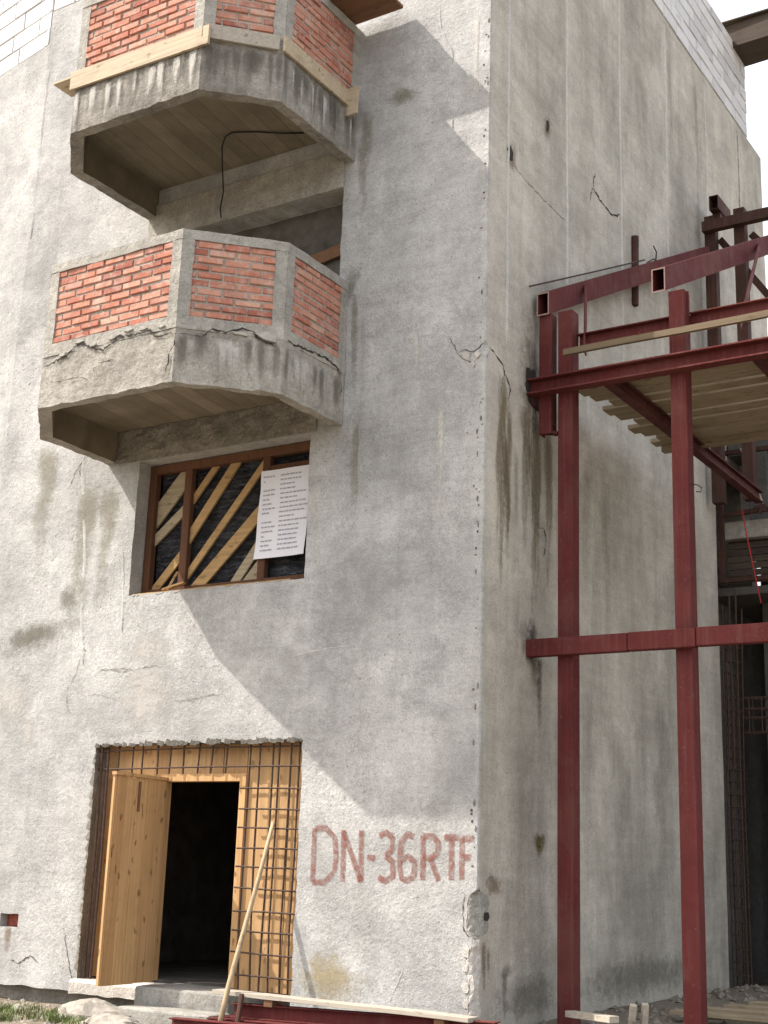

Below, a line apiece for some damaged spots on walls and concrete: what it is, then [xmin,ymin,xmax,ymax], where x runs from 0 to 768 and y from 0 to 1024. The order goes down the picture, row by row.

leakage [74,45,355,132]
spalling [230,331,277,344]
leakage [219,340,339,397]
crack [449,338,511,399]
leakage [497,387,552,529]
spalling [461,891,490,1019]